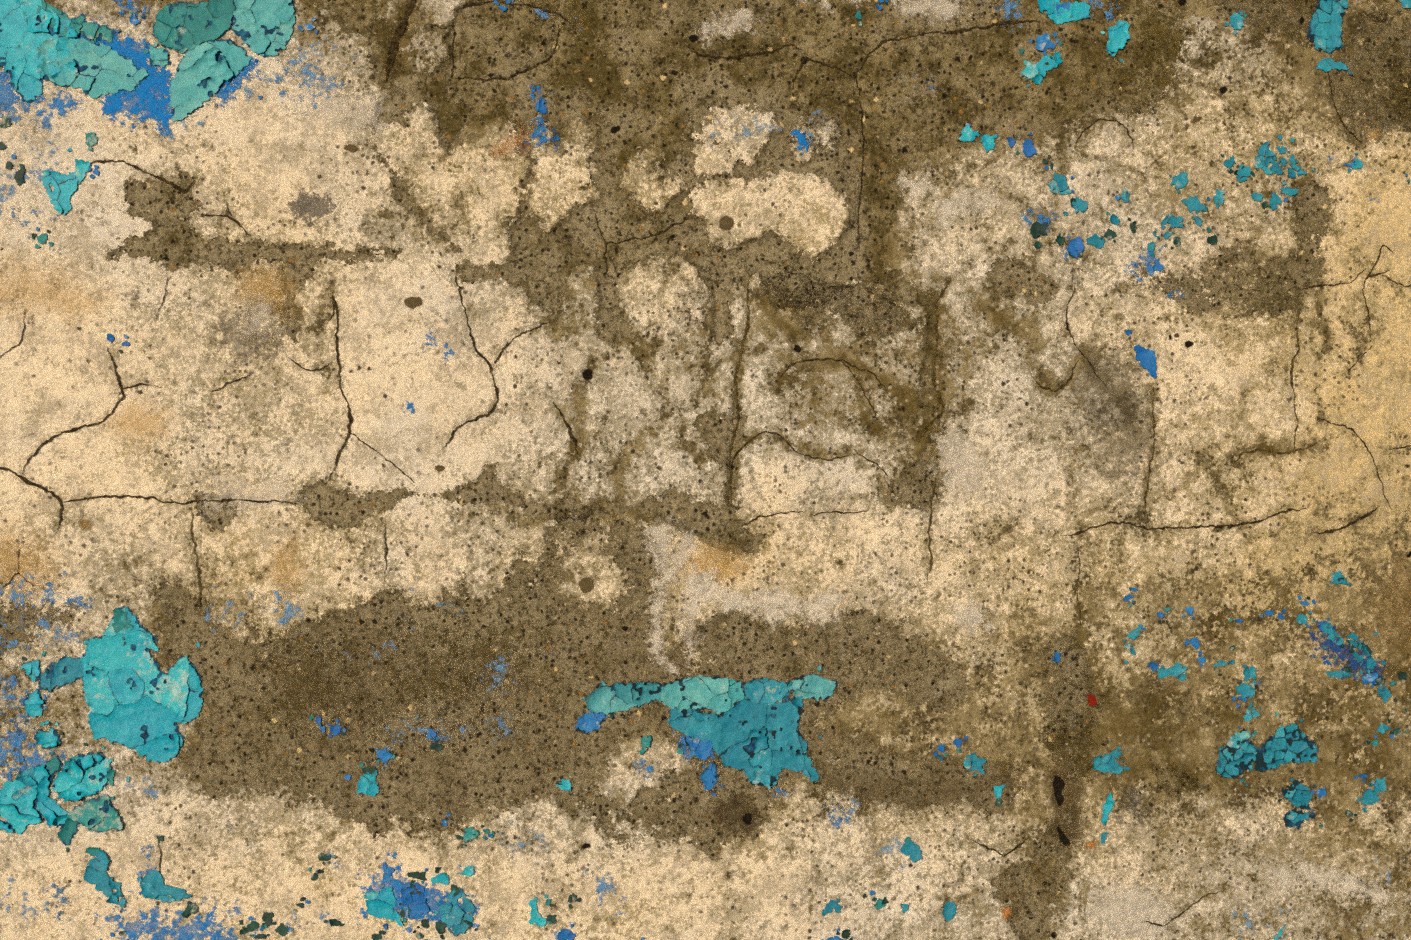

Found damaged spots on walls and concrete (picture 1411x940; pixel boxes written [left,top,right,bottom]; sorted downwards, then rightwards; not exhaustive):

leakage [892,0,972,23]
leakage [283,188,336,227]
spalling [0,0,1411,515]
leakage [897,173,1001,230]
crack [0,347,298,610]
crack [288,290,414,483]
crack [444,275,548,447]
crack [1060,245,1411,626]
spalling [0,388,1020,940]
leakage [643,518,847,675]
spalling [1030,606,1326,830]
peeling [1260,595,1409,746]